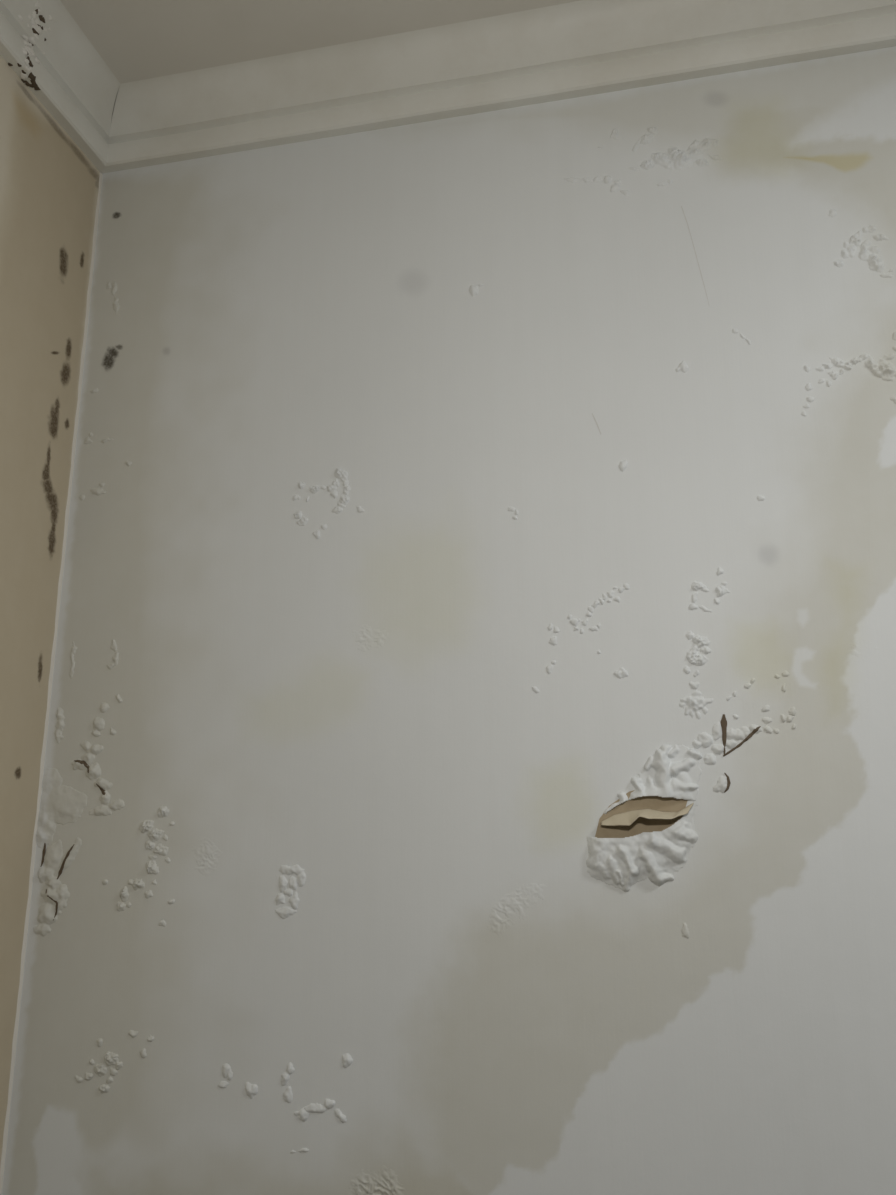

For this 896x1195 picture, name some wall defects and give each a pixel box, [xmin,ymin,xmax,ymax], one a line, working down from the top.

water stain [0,3,98,1166]
peeling [33,741,125,937]
water stain [3,153,509,1195]
water stain [360,46,896,1195]